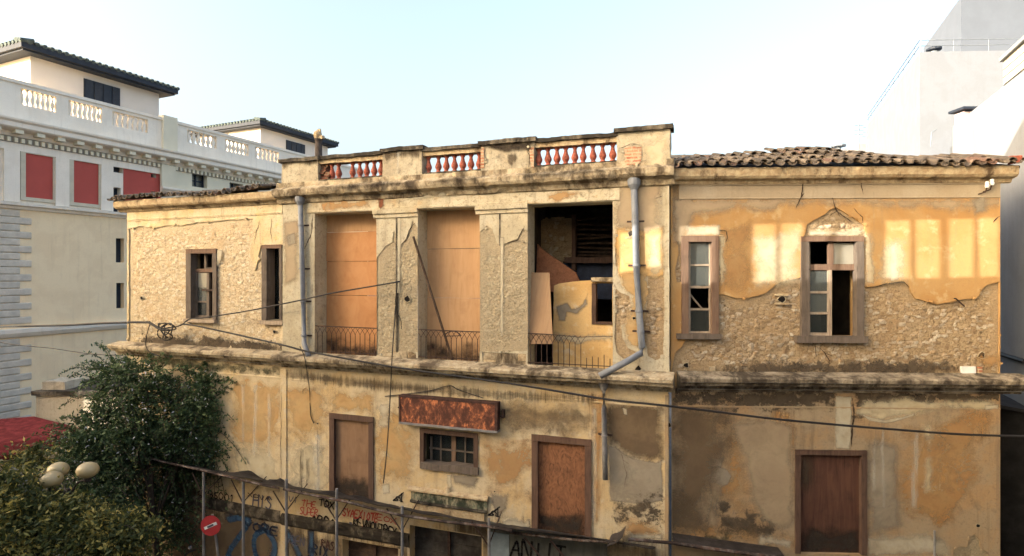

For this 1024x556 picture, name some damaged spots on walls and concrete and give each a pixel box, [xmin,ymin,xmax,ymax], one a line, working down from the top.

peeling [622,140,666,167]
crack [830,183,863,224]
flaking render [377,222,418,358]
flaking render [480,226,528,364]
flaking render [556,198,1003,374]
water stain [447,388,948,556]